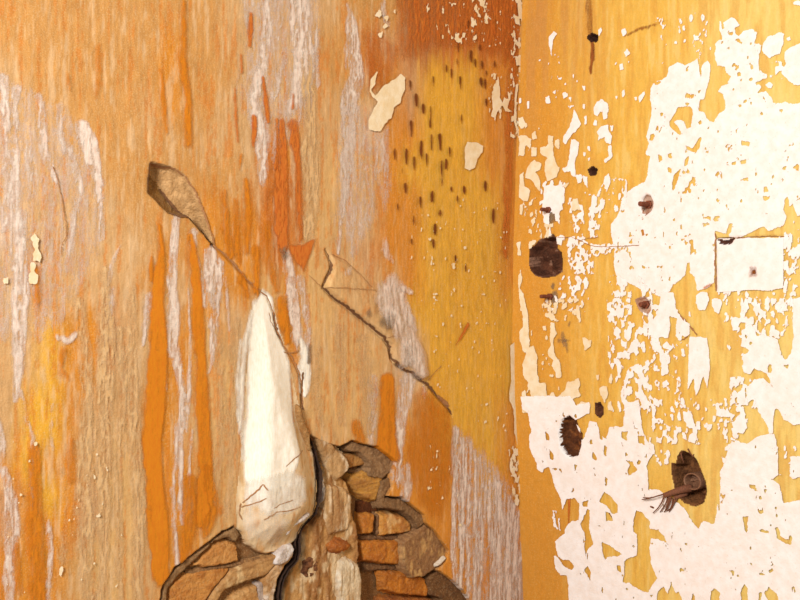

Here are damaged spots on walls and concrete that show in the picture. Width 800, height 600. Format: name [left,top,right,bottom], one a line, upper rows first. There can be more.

peeling [29,233,42,284]
spalling [147,161,215,247]
crack [213,245,304,410]
crack [309,250,452,415]
peeling [368,72,405,131]
leakage [337,4,466,255]
peeling [465,142,483,170]
leakage [470,45,496,89]
peeling [488,0,800,600]
spalling [160,404,466,600]